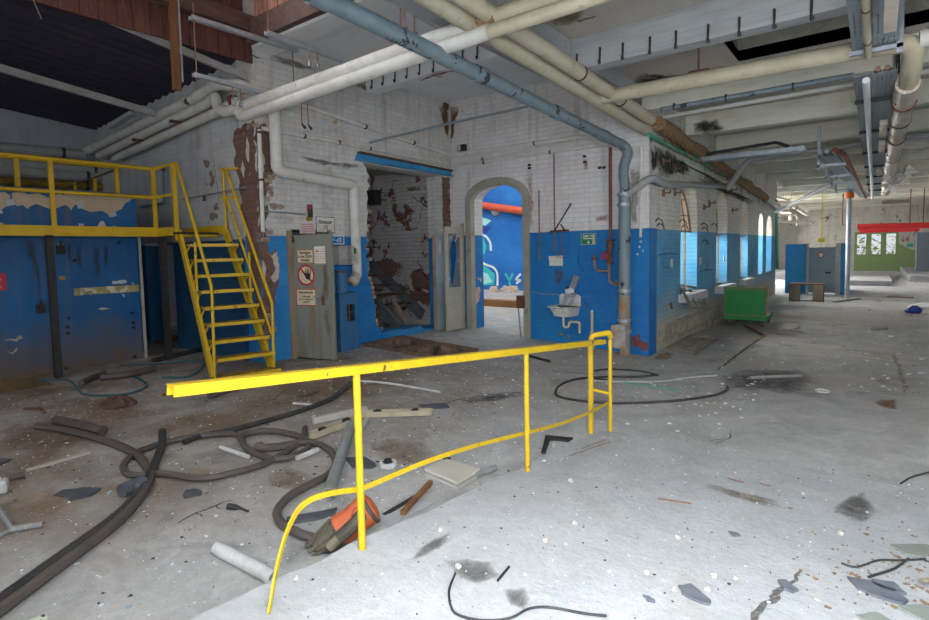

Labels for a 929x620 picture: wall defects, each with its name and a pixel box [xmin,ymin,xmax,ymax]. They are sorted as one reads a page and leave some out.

damp [651,148,688,175]
peeling [0,192,134,227]
flaking render [233,120,284,346]
flaking render [442,177,451,229]
flaking render [364,204,430,330]
spalling [359,334,467,363]
peeling [678,371,764,429]
crack [751,570,803,620]